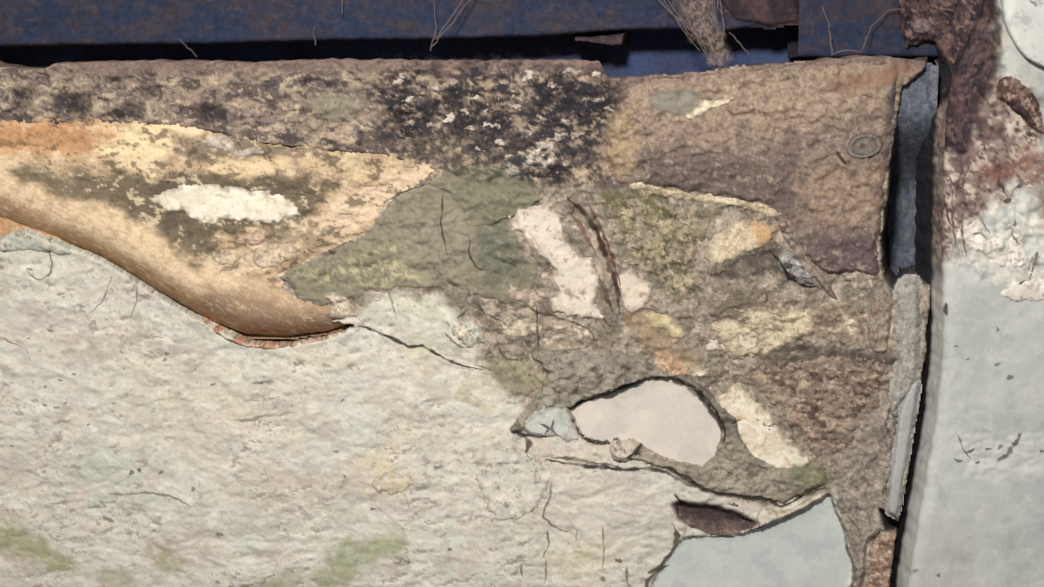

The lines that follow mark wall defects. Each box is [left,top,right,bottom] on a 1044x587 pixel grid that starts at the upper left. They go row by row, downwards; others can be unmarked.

mould [55,93,91,118]
mould [114,102,142,118]
leakage [203,102,226,118]
mould [374,60,619,186]
peeling [605,61,899,277]
flaking render [0,117,604,350]
crack [567,199,620,312]
crack [357,286,596,382]
peeling [616,271,686,339]
peeling [519,350,811,469]
peeling [652,490,852,587]
flaking render [866,528,896,587]